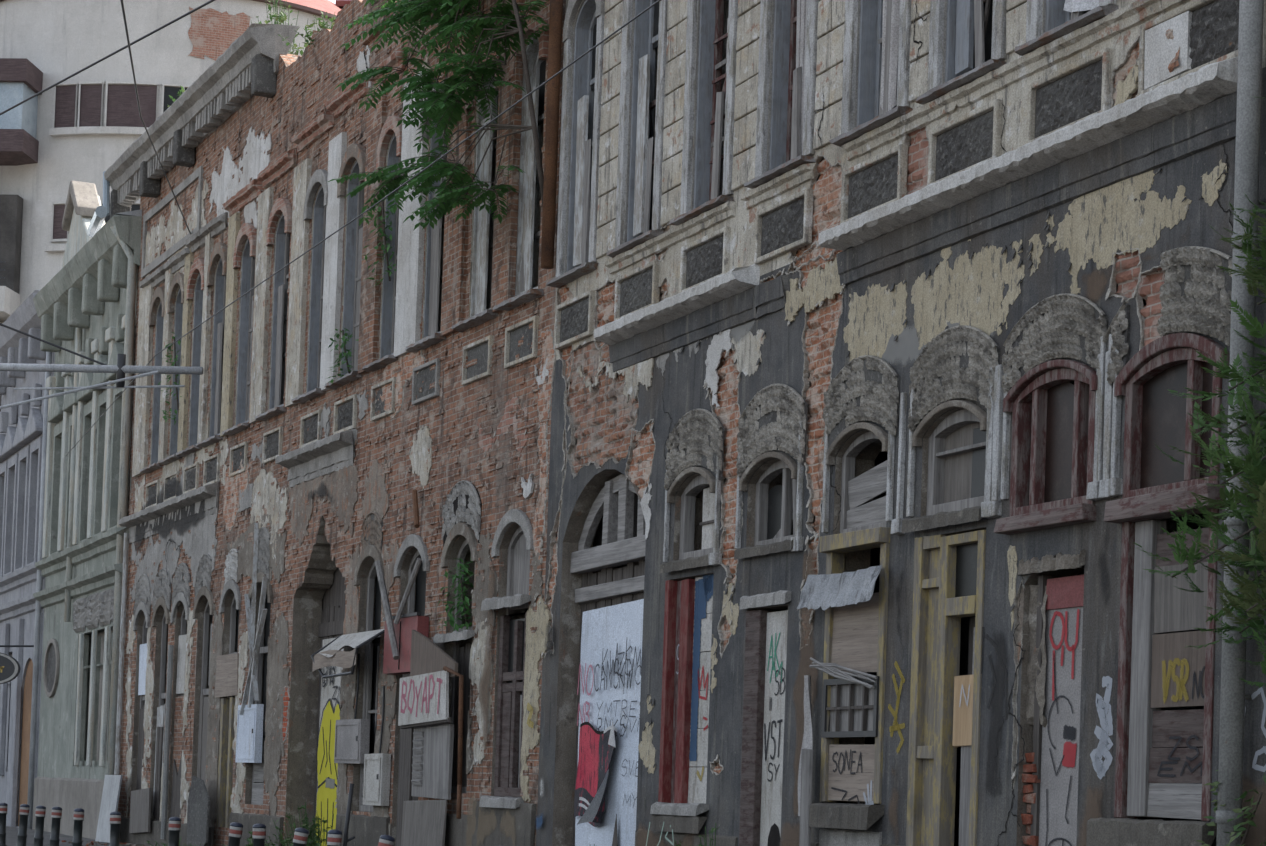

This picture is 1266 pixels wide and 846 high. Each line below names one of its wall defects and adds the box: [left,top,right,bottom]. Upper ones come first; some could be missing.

spalling [1110,36,1139,109]
spalling [1166,29,1180,72]
peeling [145,126,272,295]
peeling [760,155,1229,591]
peeling [466,532,500,775]
spalling [477,275,766,803]
spalling [1007,545,1048,790]